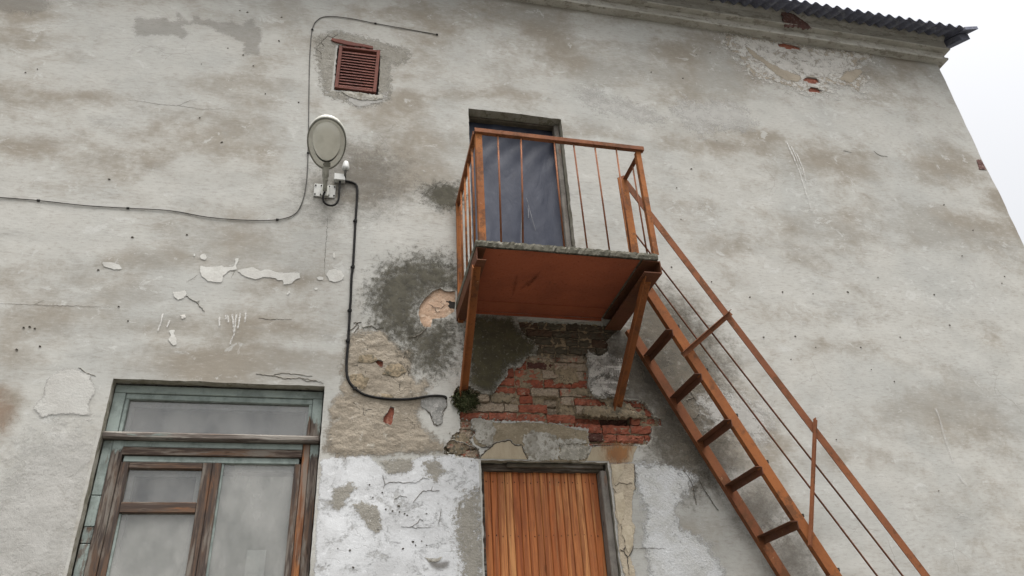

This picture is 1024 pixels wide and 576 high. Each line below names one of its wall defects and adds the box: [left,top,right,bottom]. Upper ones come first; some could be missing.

flaking render [781,12,811,30]
peeling [706,31,886,104]
peeling [194,254,300,295]
peeling [314,252,345,290]
flaking render [418,289,455,327]
peeling [314,321,726,576]
crack [382,475,460,528]